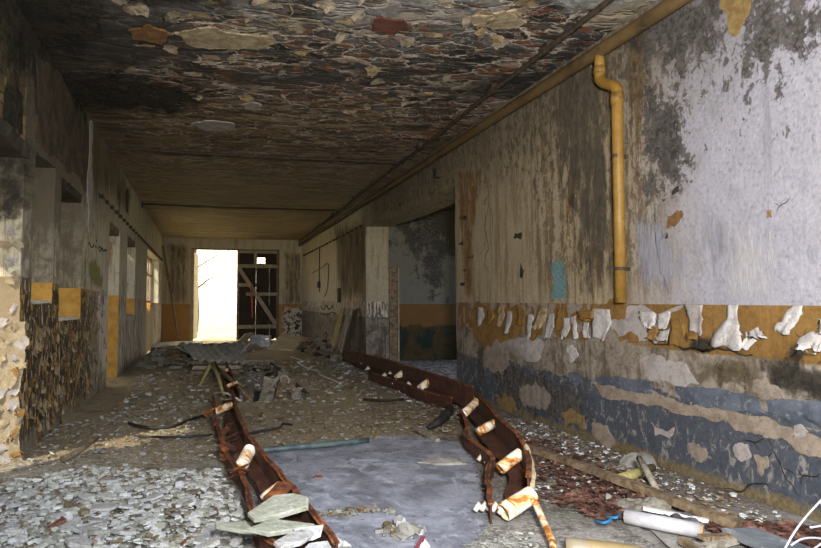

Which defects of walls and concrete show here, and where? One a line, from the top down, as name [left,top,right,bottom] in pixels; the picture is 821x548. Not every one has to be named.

flaking render [112,0,276,64]
peeling [318,0,449,50]
peeling [437,0,539,50]
flaking render [720,0,752,37]
water stain [740,0,821,118]
water stain [628,0,723,206]
water stain [553,68,613,294]
peeling [0,290,108,462]
peeling [472,298,821,458]
water stain [712,361,751,393]
water stain [762,344,821,401]
flaking render [733,443,769,477]